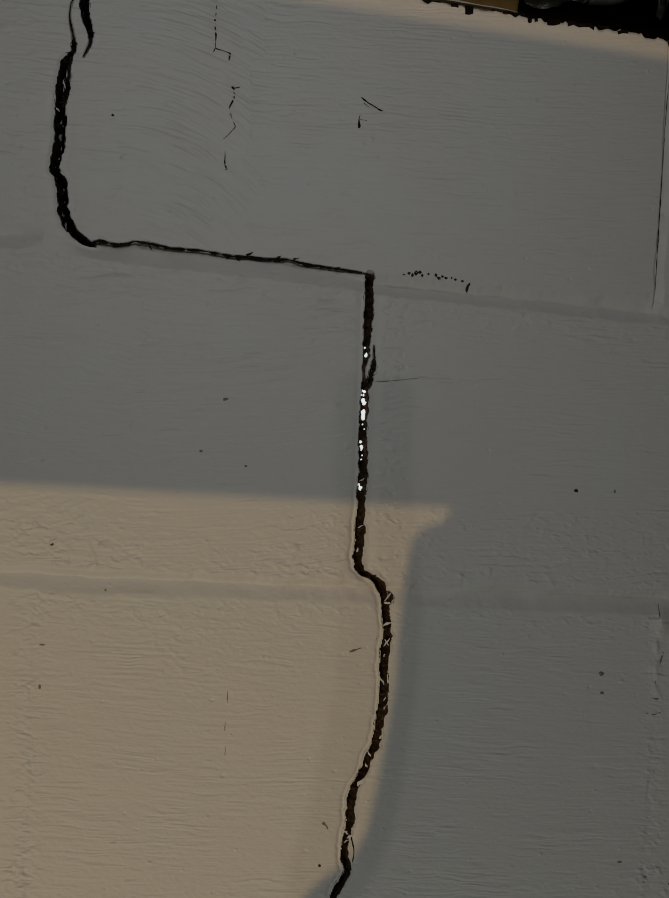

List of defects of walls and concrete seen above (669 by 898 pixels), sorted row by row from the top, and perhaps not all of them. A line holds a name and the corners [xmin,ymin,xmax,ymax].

crack [49,0,417,898]